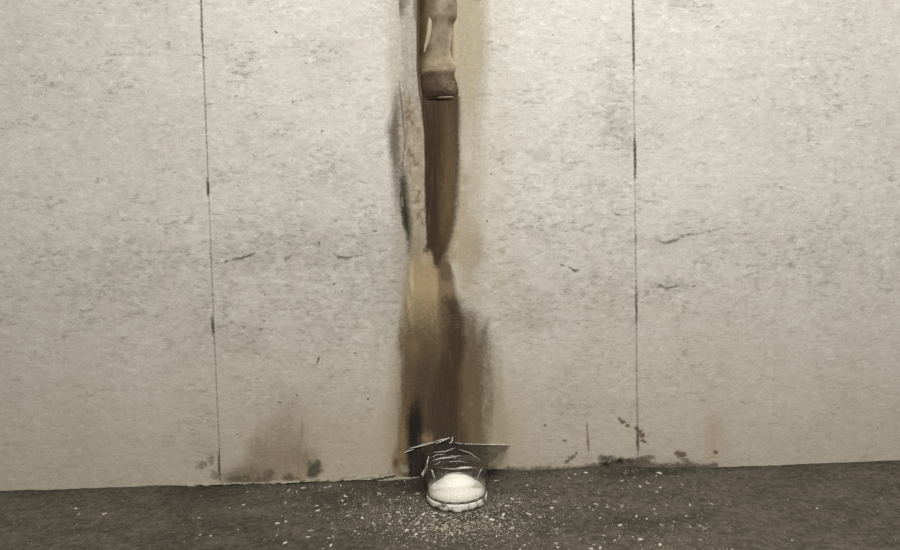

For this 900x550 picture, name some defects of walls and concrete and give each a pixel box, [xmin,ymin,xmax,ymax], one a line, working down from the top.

damp [308,461,320,477]
damp [389,0,718,477]